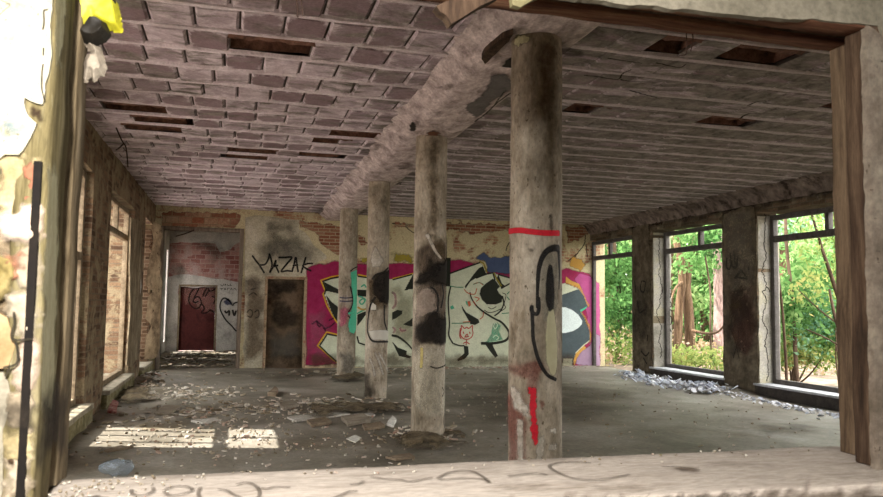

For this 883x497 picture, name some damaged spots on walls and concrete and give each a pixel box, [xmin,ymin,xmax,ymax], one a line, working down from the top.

peeling [55,0,66,65]
peeling [0,153,59,497]
flaking render [125,211,340,368]